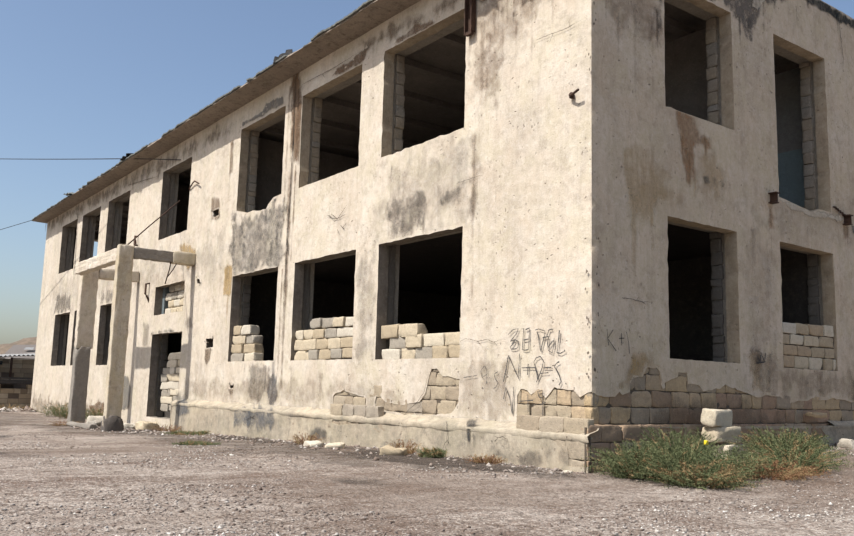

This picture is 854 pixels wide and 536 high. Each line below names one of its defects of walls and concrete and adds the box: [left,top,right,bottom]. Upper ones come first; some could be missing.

damp [724,0,782,33]
damp [289,73,302,161]
rust [677,111,710,181]
damp [223,206,282,295]
damp [234,376,277,429]
spalling [328,369,460,432]
spalling [508,367,854,473]